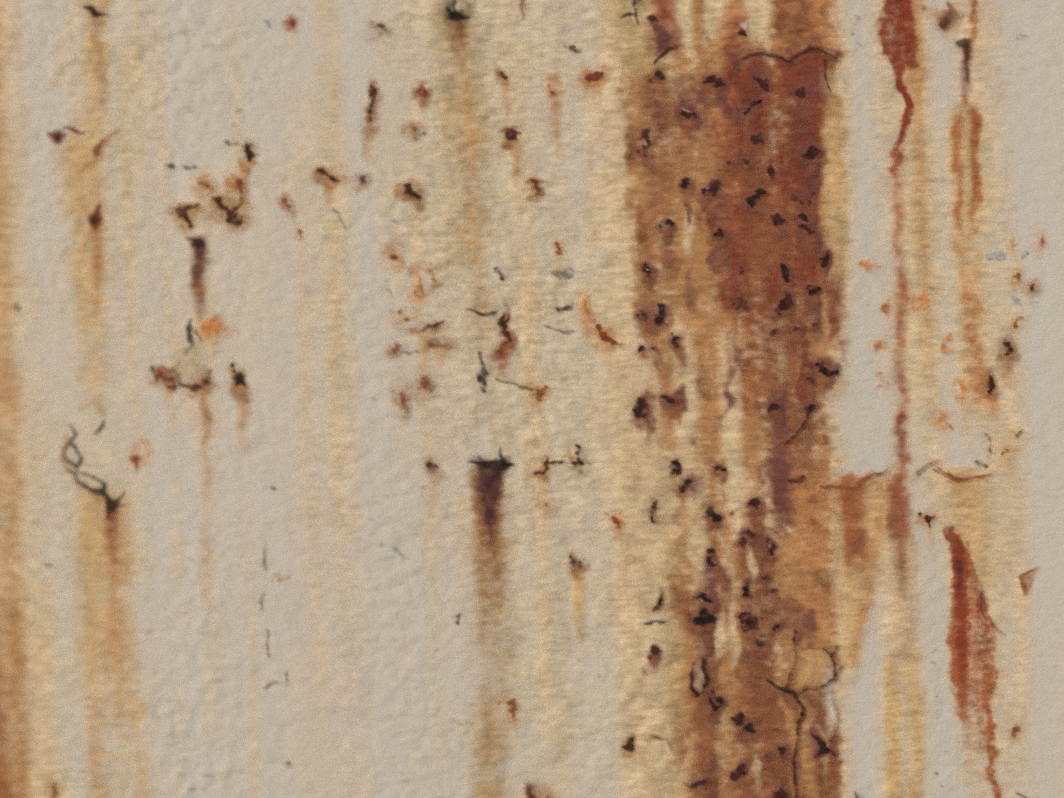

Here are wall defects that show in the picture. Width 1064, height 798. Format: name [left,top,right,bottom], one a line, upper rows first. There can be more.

corrosion [173,143,255,304]
corrosion [0,0,59,798]
corrosion [191,317,222,352]
corrosion [227,363,249,426]
corrosion [581,0,1020,798]
corrosion [469,452,513,573]
corrosion [1018,567,1038,620]
crack [767,630,837,798]